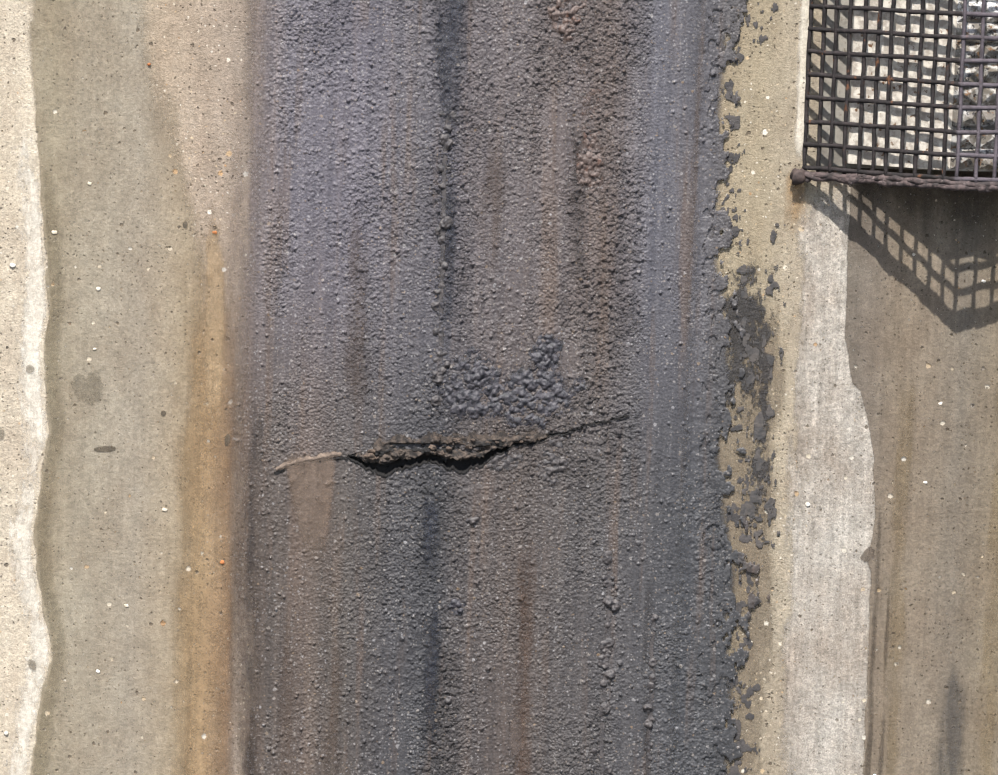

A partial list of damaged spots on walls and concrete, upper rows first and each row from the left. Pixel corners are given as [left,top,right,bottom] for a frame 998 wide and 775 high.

corrosion [179,326,234,775]
crack [274,415,629,477]
leakage [234,0,733,775]
peeling [672,0,786,775]